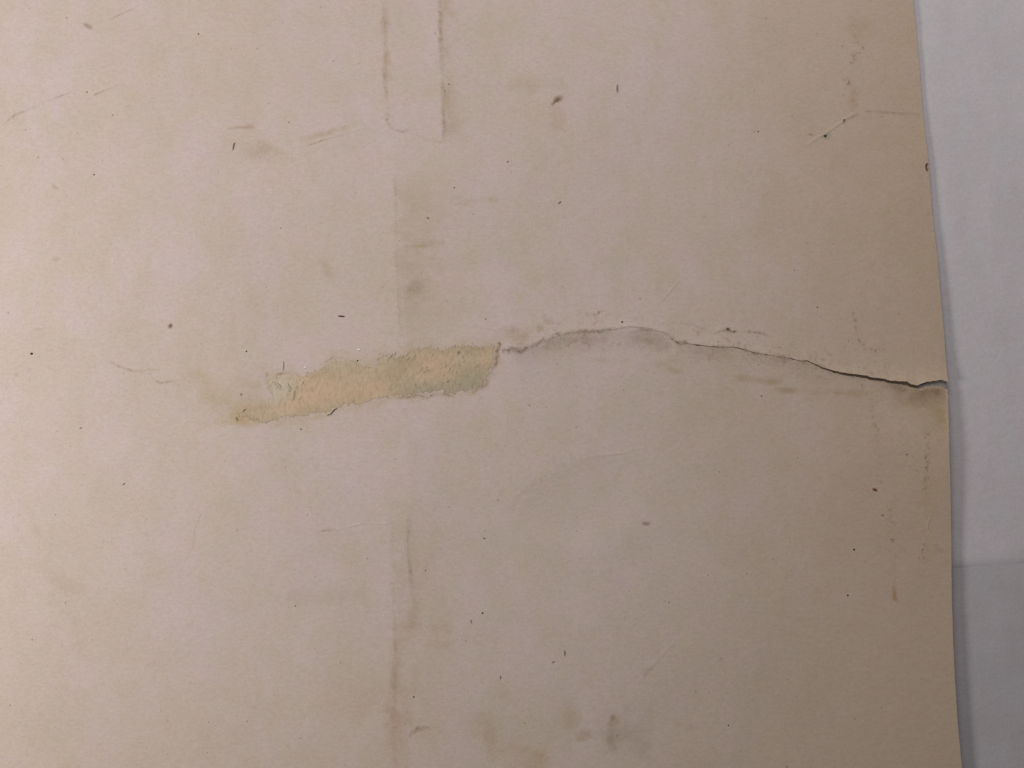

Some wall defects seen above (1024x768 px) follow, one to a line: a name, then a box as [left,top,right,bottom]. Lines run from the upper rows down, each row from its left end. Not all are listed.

peeling [236,342,501,424]